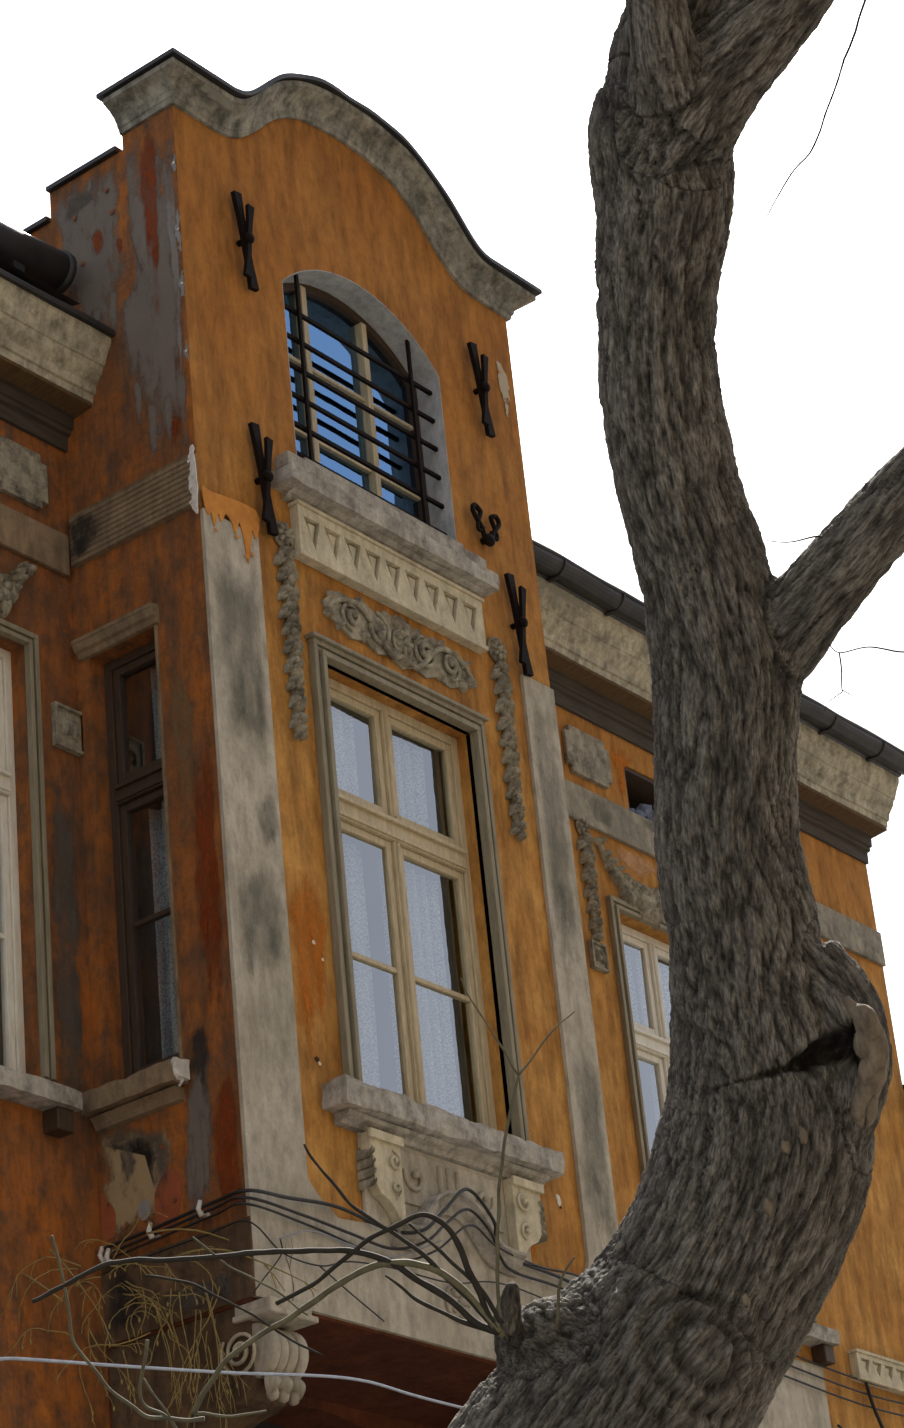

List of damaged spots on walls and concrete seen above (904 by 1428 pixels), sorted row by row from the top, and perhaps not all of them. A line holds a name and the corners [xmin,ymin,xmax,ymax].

peeling [496,361,510,417]
peeling [187,444,260,563]
flaking render [102,1130,176,1233]